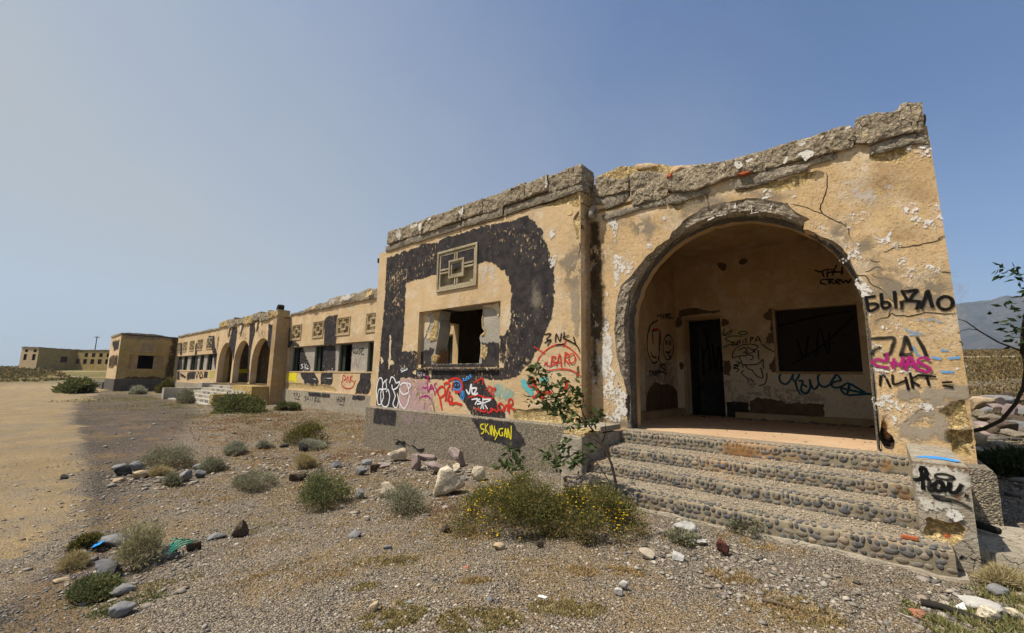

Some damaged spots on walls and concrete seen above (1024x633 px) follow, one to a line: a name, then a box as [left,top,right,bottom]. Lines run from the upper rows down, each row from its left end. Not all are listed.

crack [765,173,850,237]
peeling [904,202,943,229]
spalling [513,142,873,428]
crack [853,235,963,346]
spalling [715,312,1024,458]
spalling [912,464,971,561]